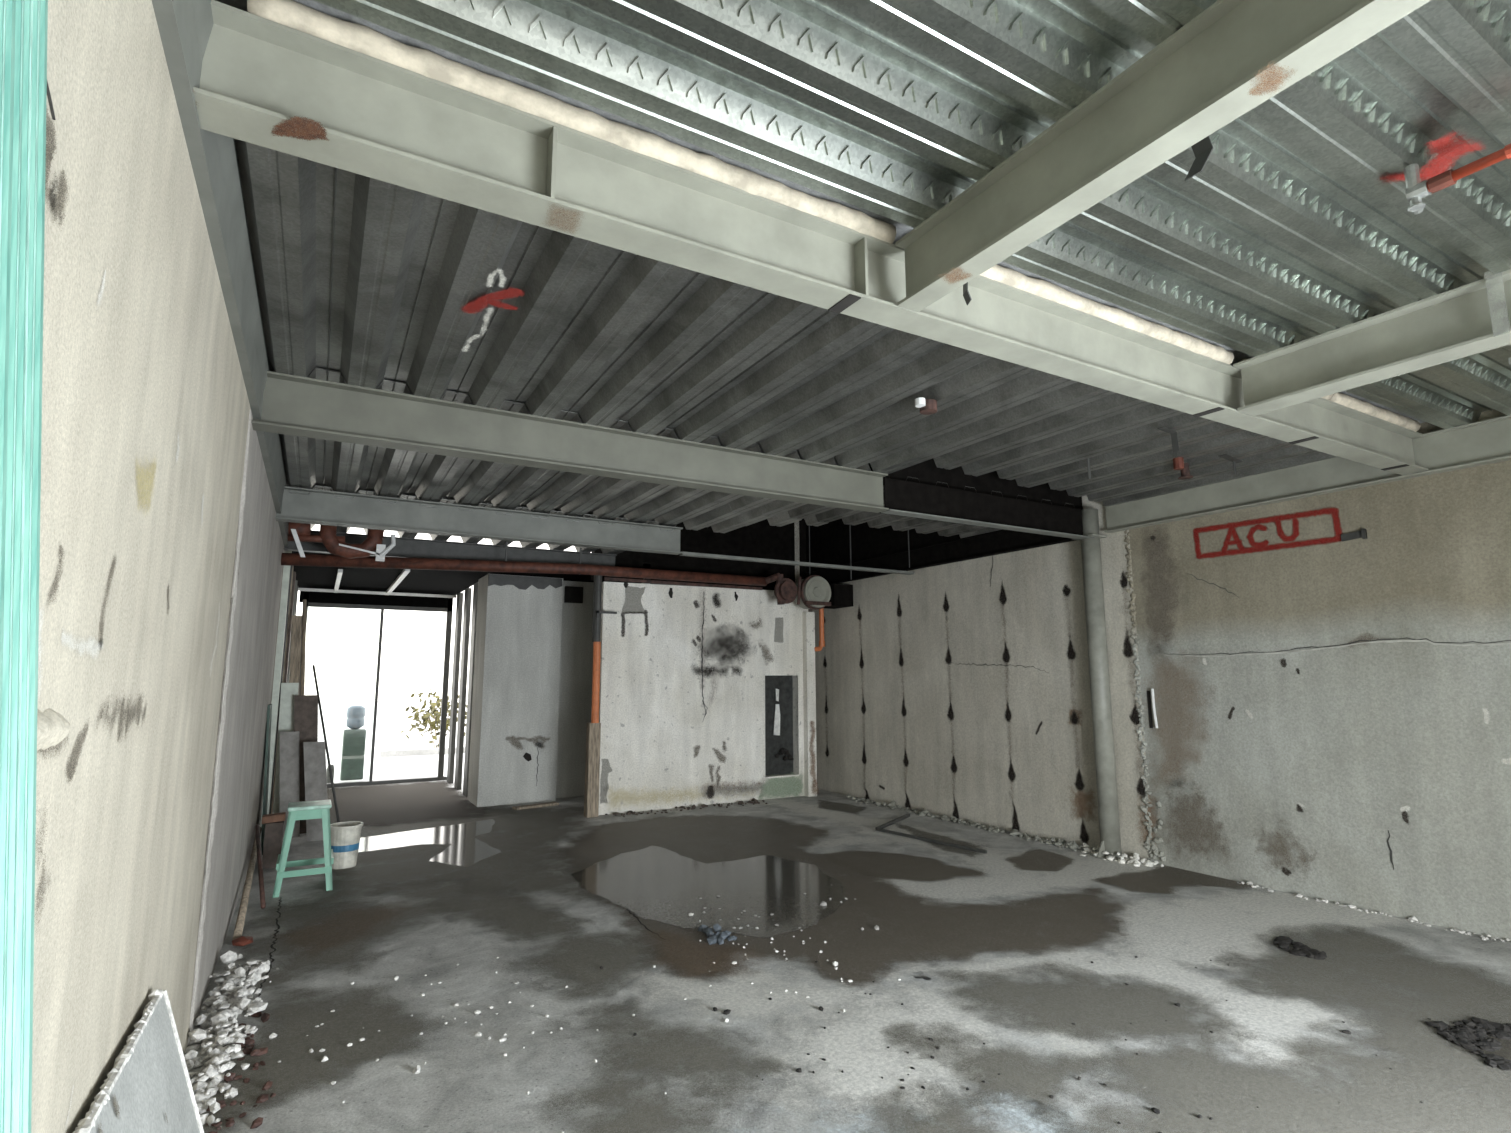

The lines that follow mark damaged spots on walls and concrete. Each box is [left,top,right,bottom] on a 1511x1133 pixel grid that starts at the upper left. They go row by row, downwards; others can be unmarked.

rust [1248,61,1297,96]
rust [270,115,328,141]
damp [45,106,70,231]
crack [1173,637,1511,657]
damp [34,798,55,934]
crack [1386,830,1394,870]